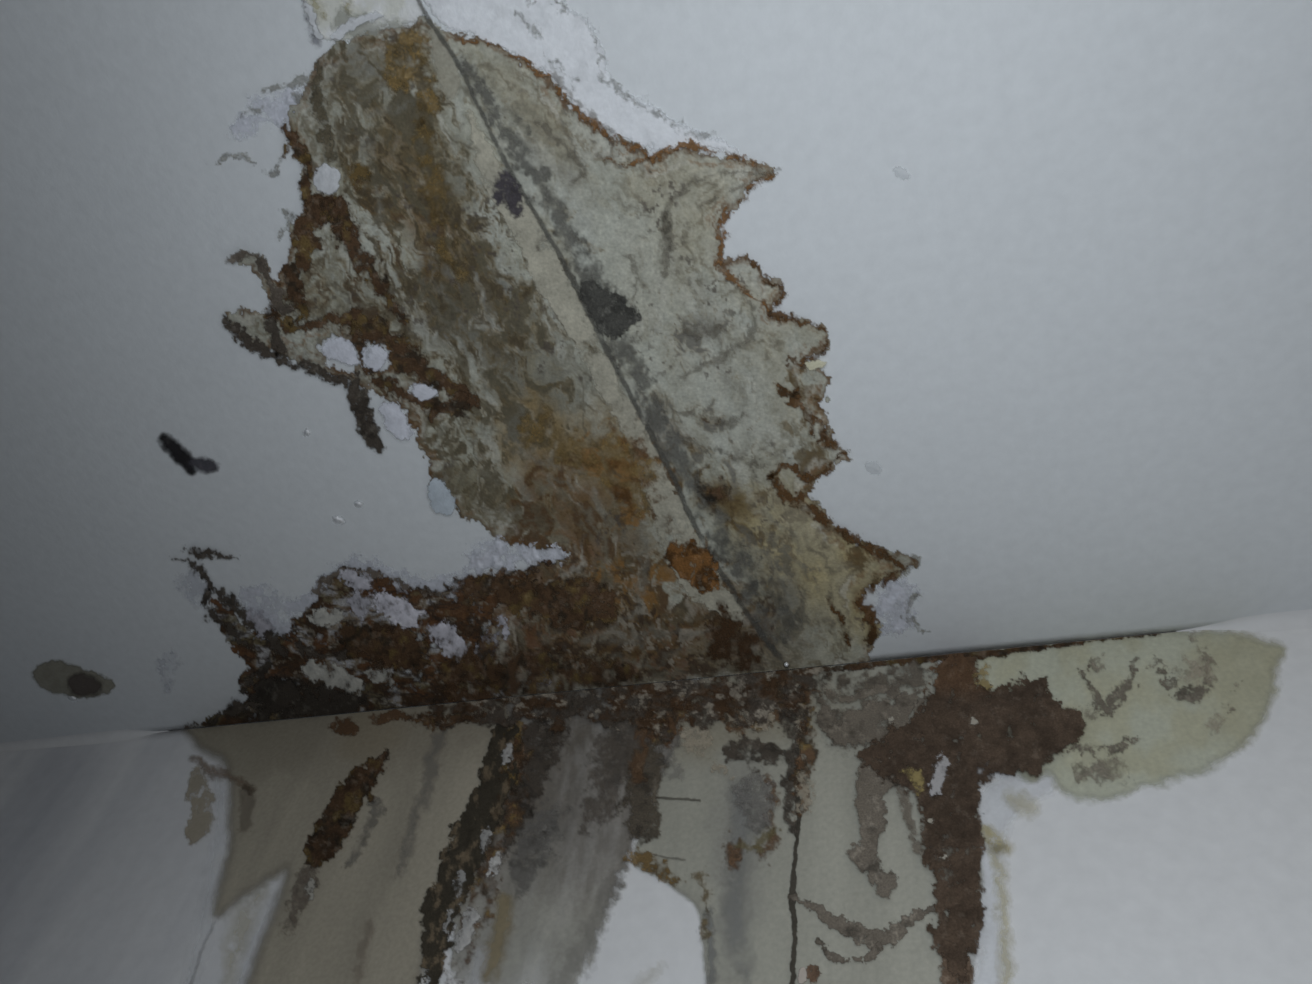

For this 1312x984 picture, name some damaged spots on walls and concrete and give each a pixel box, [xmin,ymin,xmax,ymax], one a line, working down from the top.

flaking render [222,0,919,702]
leakage [33,660,115,698]
rust [285,749,389,924]
rust [172,547,567,729]
leakage [185,630,1285,984]
crack [789,715,801,984]